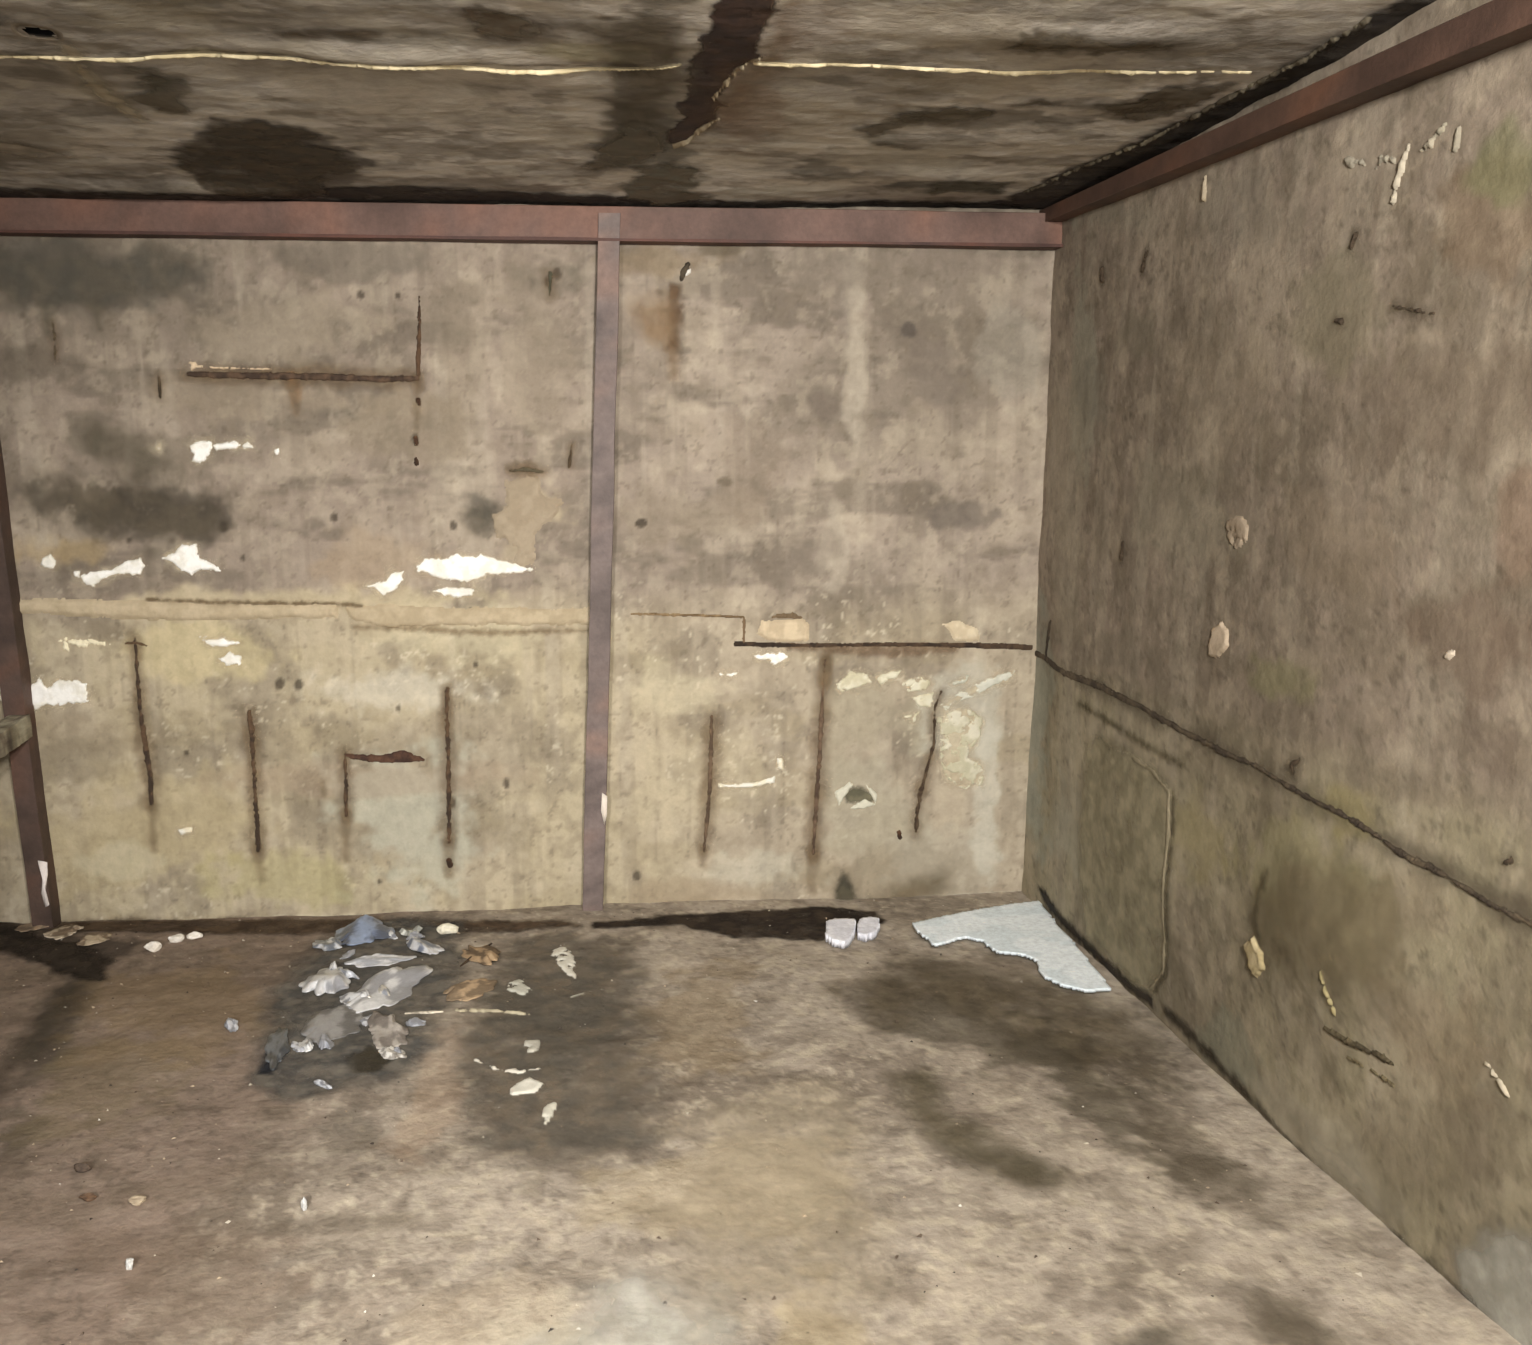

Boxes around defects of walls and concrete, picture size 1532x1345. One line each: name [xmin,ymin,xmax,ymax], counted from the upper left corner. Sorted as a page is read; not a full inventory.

leakage [171,118,360,198]
leakage [854,107,995,150]
leakage [927,182,1014,195]
leakage [1101,83,1234,121]
corrosion [187,296,422,406]
peeling [366,553,533,598]
corrosion [125,637,154,805]
corrosion [343,750,425,821]
corrosion [444,687,453,868]
flaking render [834,782,877,809]
peeling [836,670,1015,789]
crack [631,612,1532,927]